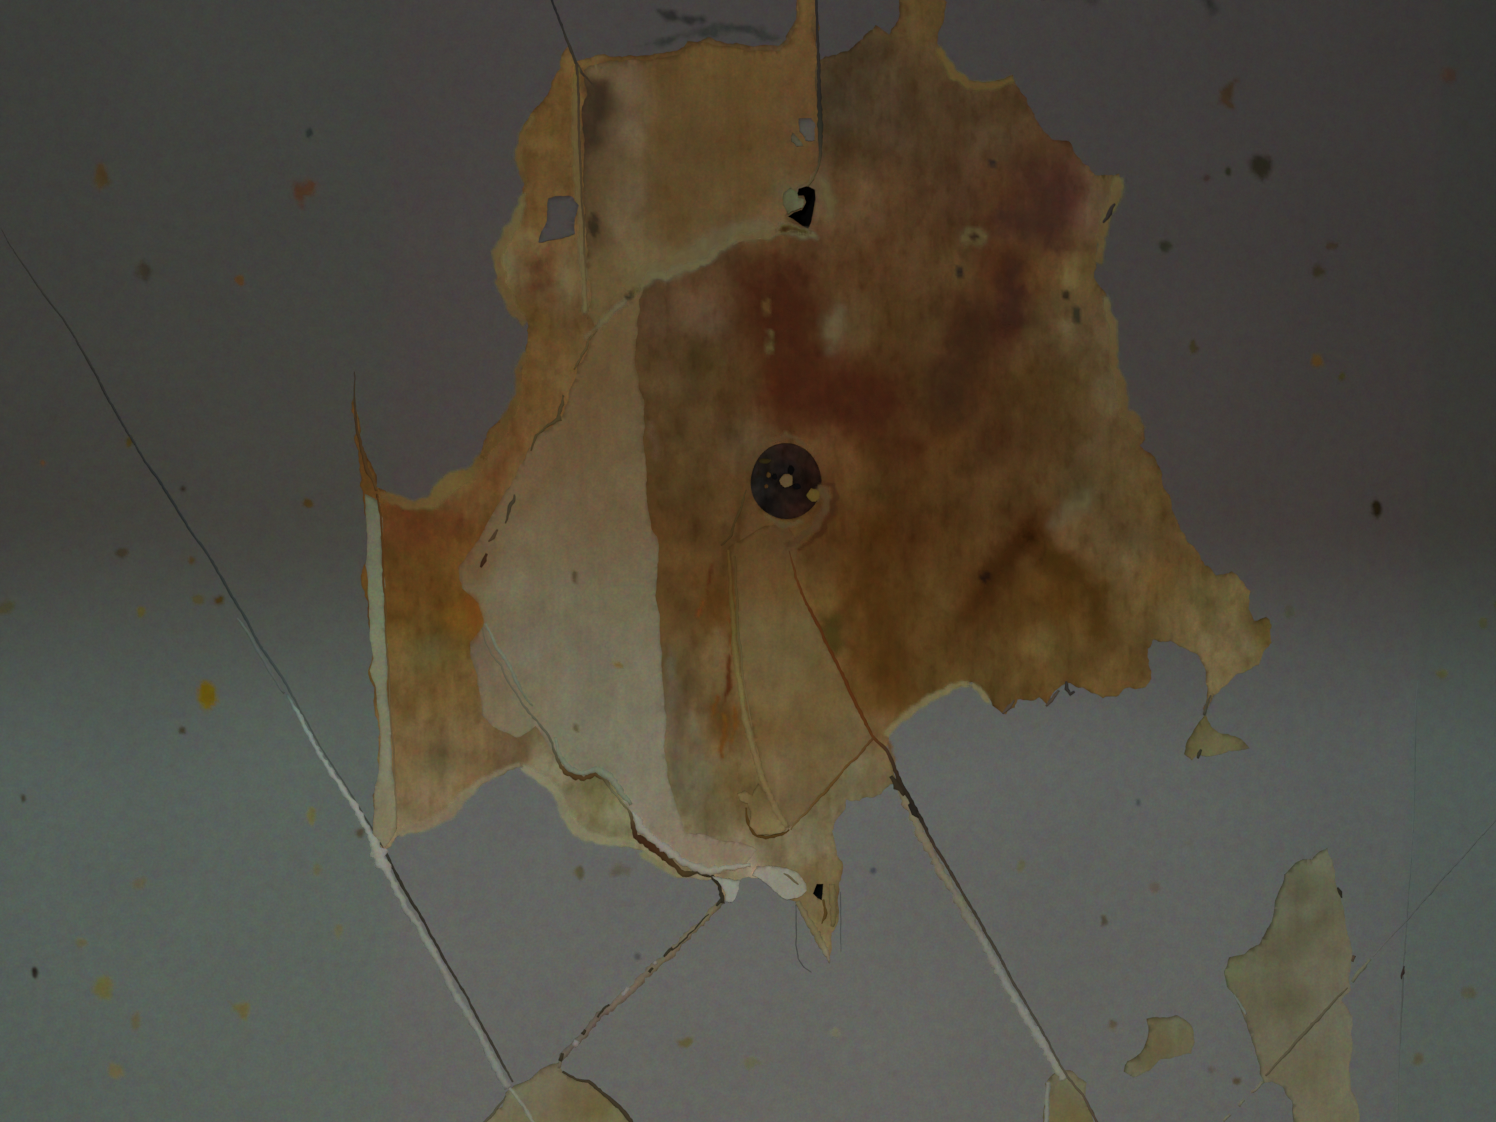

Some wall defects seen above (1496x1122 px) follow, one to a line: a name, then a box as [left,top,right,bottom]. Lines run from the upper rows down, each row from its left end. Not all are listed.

crack [807,0,823,187]
peeling [351,0,1272,963]
crack [1,229,516,1090]
crack [482,624,725,1069]
crack [789,551,1098,1122]
peeling [484,1062,633,1122]
peeling [1043,1070,1093,1122]
peeling [1124,1015,1195,1077]
peeling [1224,848,1360,1122]